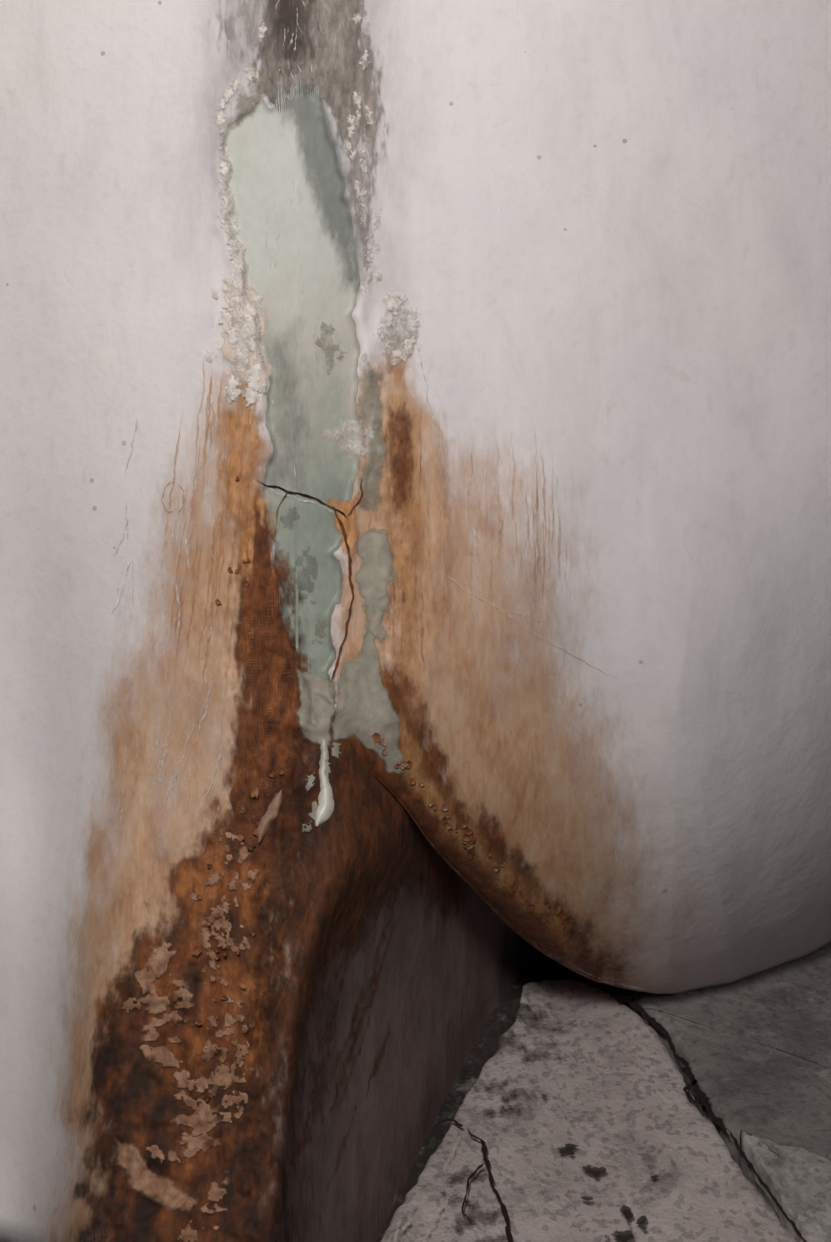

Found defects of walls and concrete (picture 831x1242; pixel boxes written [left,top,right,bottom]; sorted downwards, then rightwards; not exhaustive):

corrosion [51,379,344,1242]
crack [256,479,363,681]
peeling [205,0,425,680]
crack [437,1119,514,1242]
corrosion [337,361,636,990]
crack [603,985,807,1242]